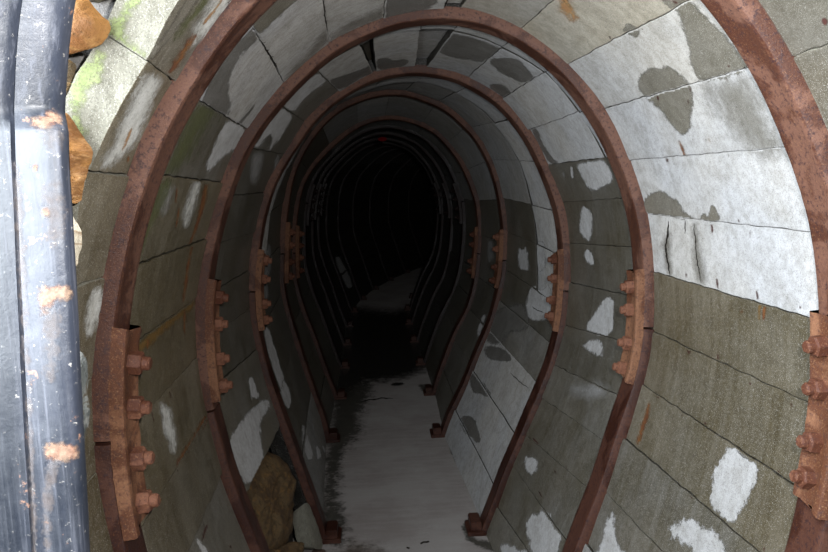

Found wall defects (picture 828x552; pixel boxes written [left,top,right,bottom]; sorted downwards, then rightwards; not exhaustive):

corrosion [560,0,578,19]
damp [440,34,533,82]
damp [638,66,694,135]
damp [663,0,768,148]
damp [644,191,720,221]
crack [665,220,701,281]